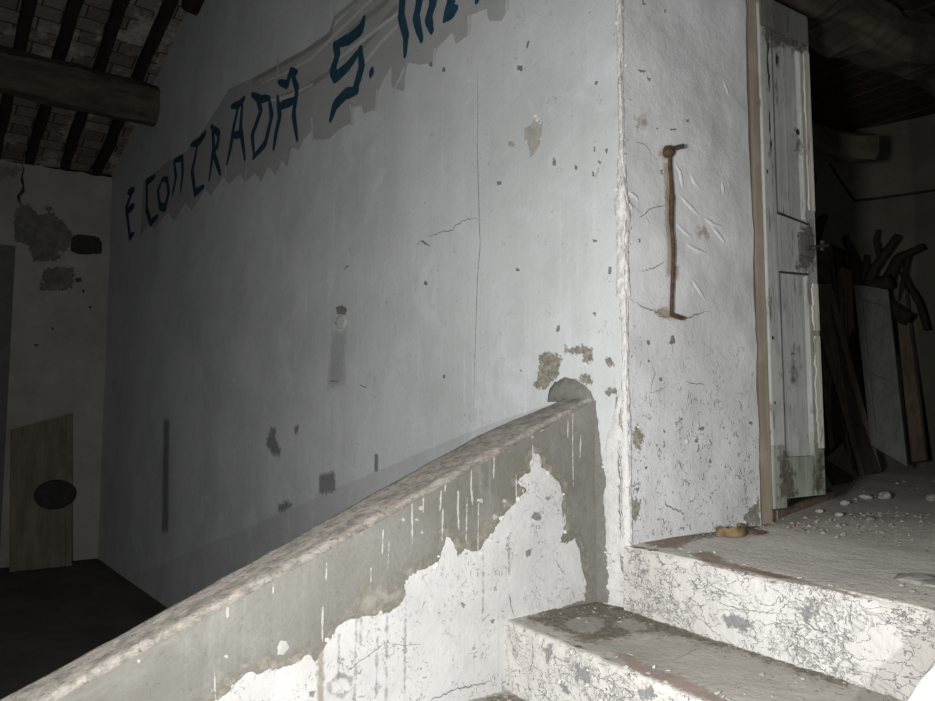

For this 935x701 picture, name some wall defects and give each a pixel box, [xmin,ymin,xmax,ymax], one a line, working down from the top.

peeling [508,114,543,157]
crack [17,162,25,205]
flaking render [13,205,85,293]
flaking render [534,344,594,389]
peeling [197,446,593,701]